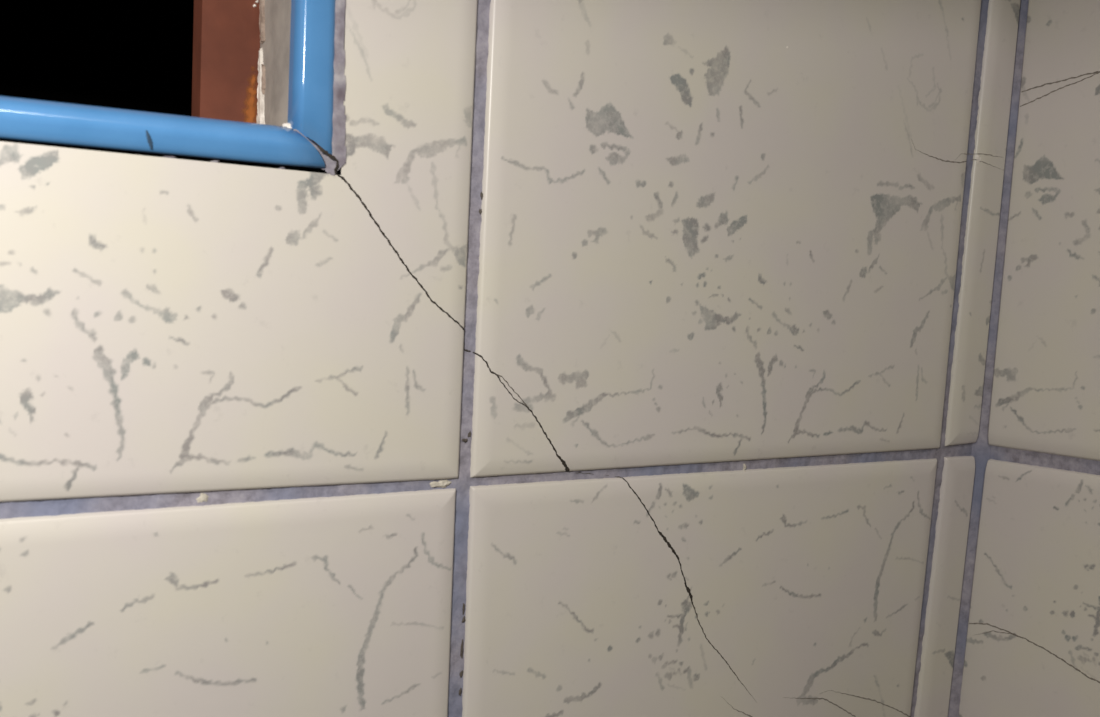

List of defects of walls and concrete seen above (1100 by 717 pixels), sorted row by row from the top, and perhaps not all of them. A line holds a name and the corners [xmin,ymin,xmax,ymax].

crack [307,137,755,717]
crack [969,623,1100,683]
crack [783,690,910,717]